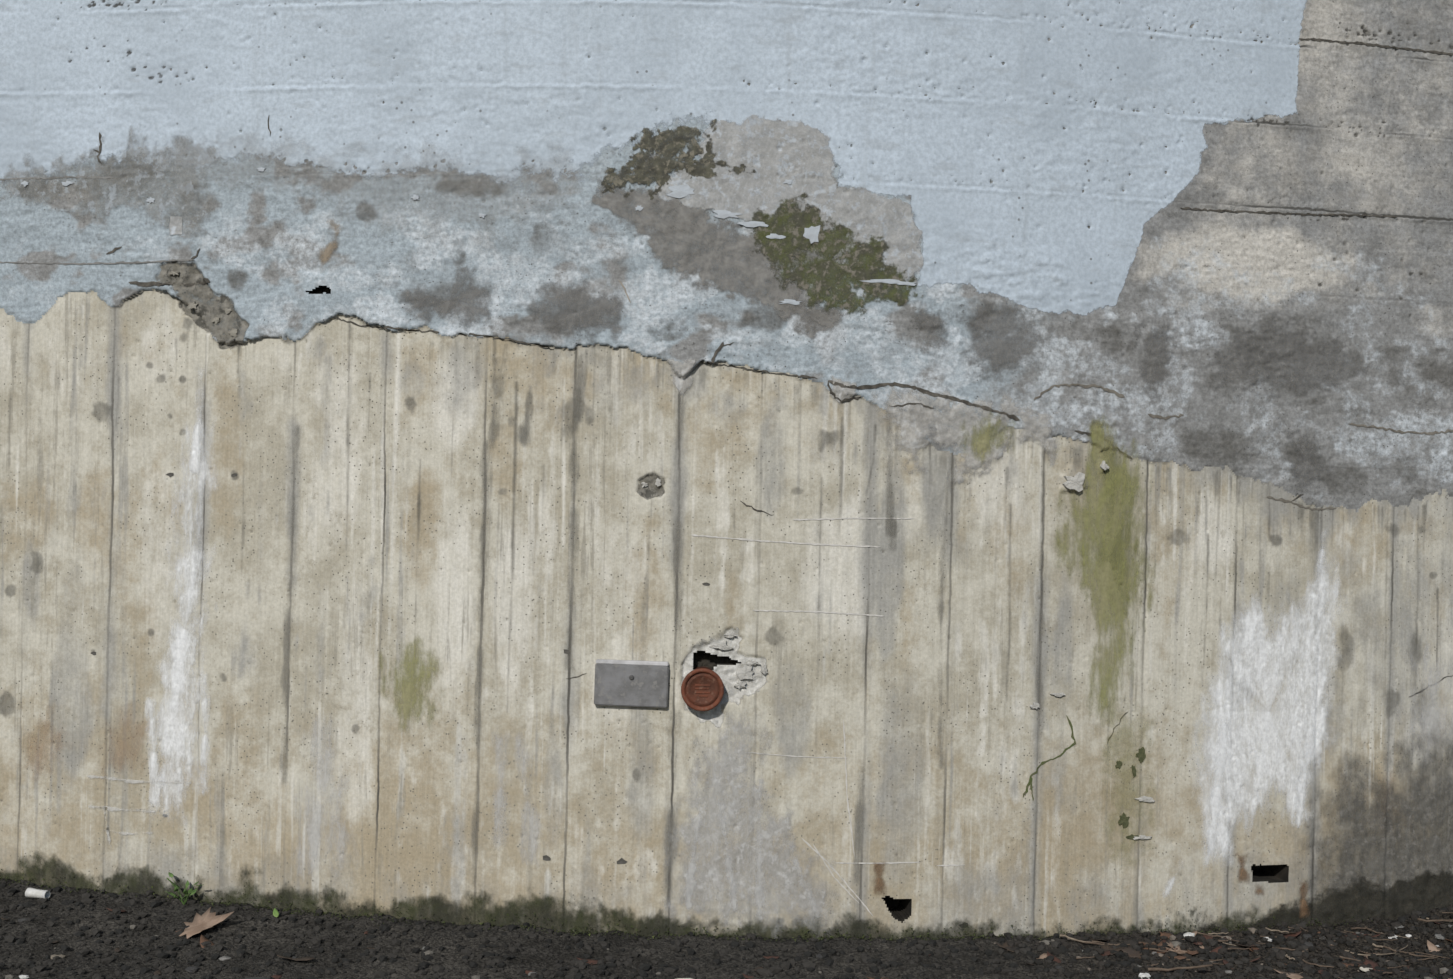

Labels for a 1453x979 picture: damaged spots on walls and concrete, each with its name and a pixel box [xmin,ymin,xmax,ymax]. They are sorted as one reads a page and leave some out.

peeling [592,115,924,338]
spalling [156,262,249,349]
spalling [306,286,331,294]
crack [700,342,1183,421]
spalling [637,474,665,499]
crack [1075,430,1133,460]
water stain [147,421,212,810]
spalling [681,628,768,727]
crack [1023,692,1128,800]
water stain [1200,550,1338,864]
water stain [1241,676,1453,932]
spalling [882,896,912,923]